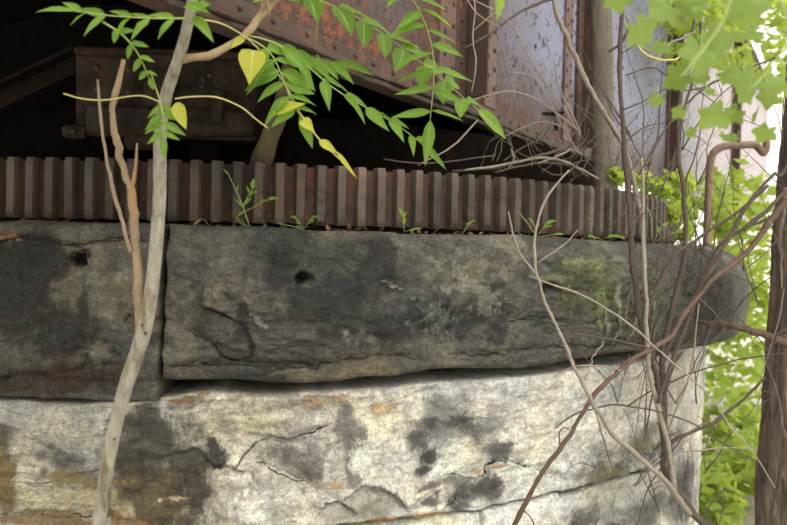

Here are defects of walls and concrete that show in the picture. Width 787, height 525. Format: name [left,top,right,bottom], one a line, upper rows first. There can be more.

water stain [0,231,119,397]
crack [161,306,417,371]
water stain [264,235,514,345]
crack [450,345,589,359]
crack [504,311,623,327]
water stain [562,254,638,345]
crack [233,423,331,482]
water stain [107,396,518,525]
crack [446,458,615,492]